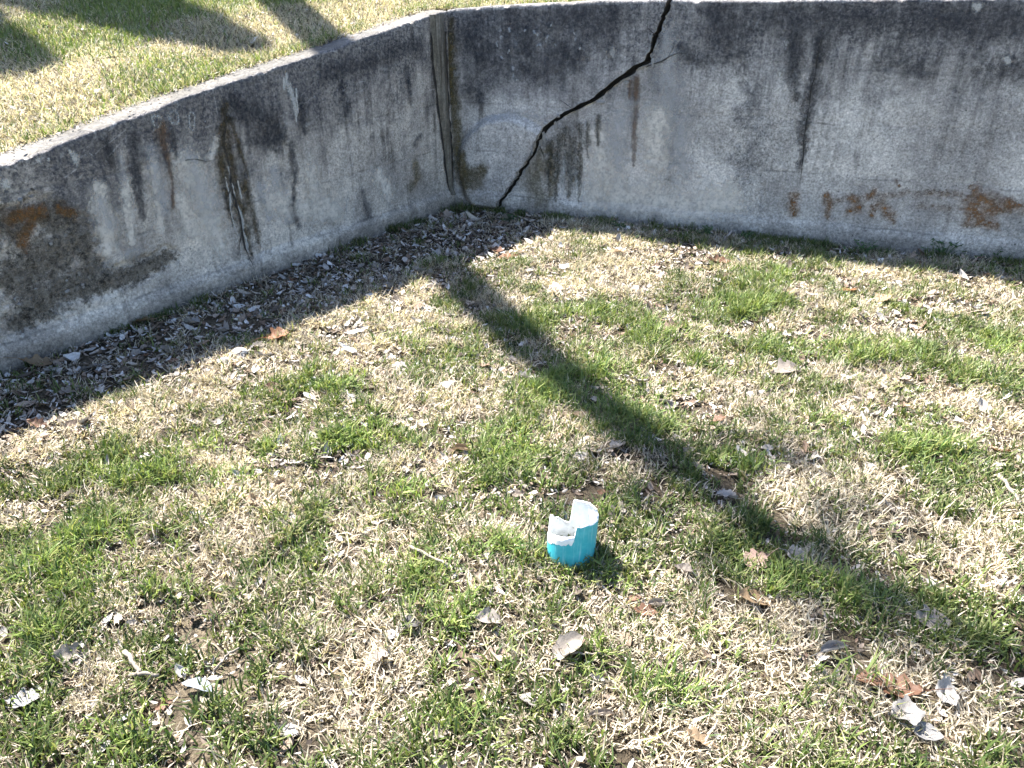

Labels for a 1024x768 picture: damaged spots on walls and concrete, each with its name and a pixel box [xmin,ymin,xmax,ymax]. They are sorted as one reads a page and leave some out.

crack [497,0,683,209]
rust [628,77,639,166]
water stain [545,1,1024,226]
rust [6,202,76,250]
water stain [89,92,340,269]
water stain [374,167,394,202]
rust [822,189,895,221]
rust [961,185,1023,230]